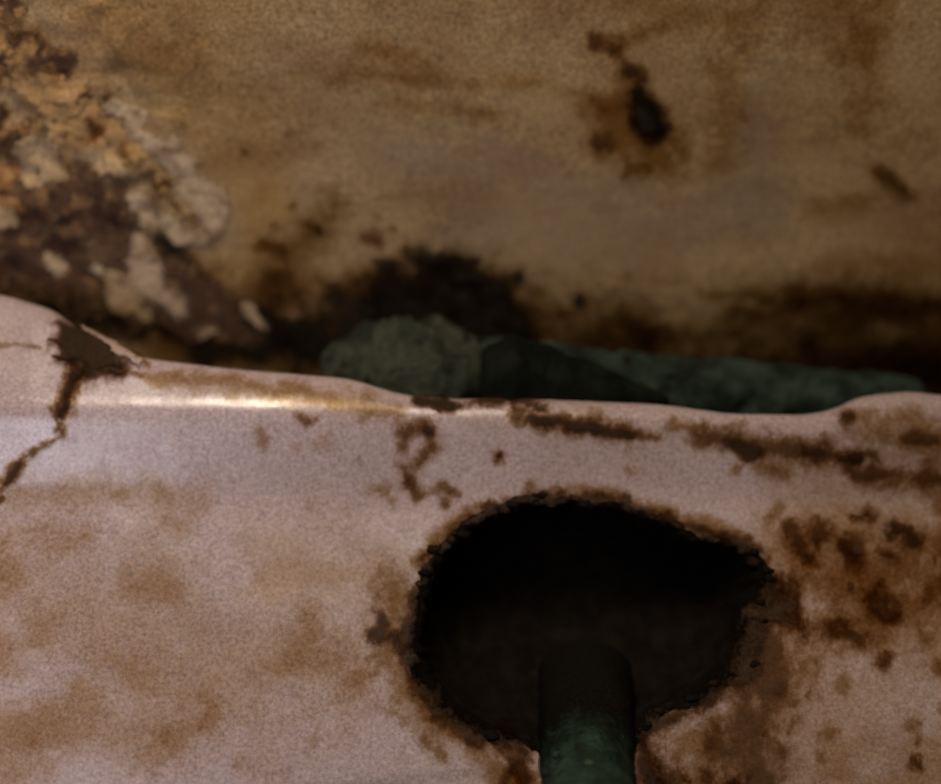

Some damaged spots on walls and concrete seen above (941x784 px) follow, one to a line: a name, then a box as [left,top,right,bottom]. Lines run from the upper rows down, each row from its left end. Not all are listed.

flaking render [0,64,326,381]
mould [186,244,539,375]
crack [0,338,83,502]
corrosion [397,419,436,499]
corrosion [411,395,657,439]
corrosion [693,424,893,481]
corrosion [784,518,828,563]
corrosion [883,520,923,558]
corrosion [367,489,805,784]